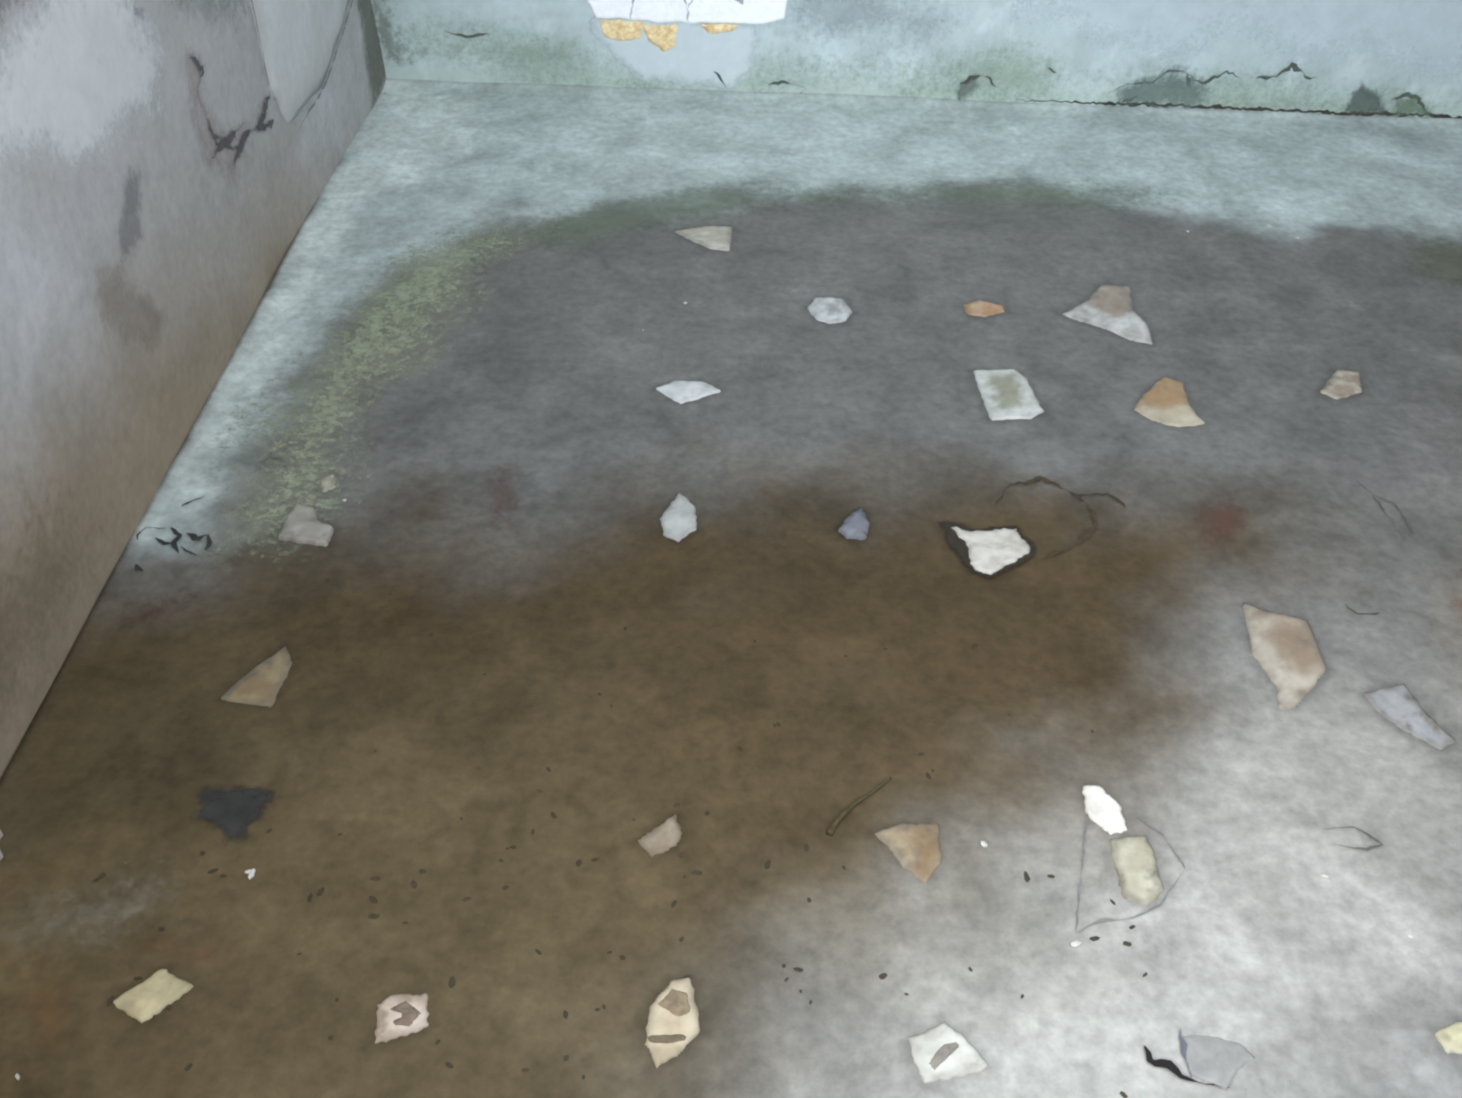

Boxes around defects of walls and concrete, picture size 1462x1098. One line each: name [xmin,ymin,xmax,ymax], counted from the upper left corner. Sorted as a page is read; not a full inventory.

peeling [587,0,787,52]
crack [190,53,274,167]
leakage [122,177,140,253]
crack [995,476,1126,559]
spalling [199,787,274,838]